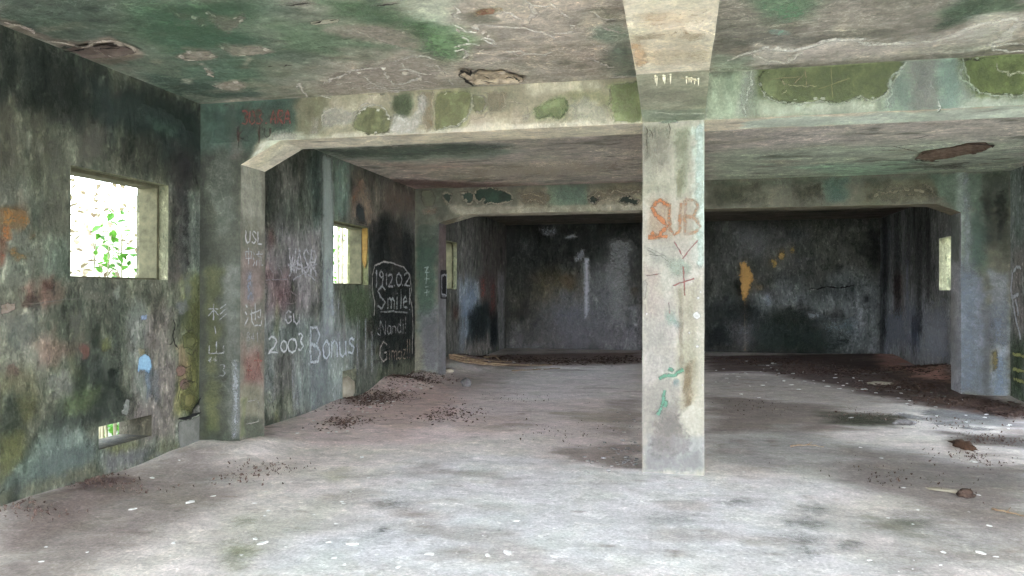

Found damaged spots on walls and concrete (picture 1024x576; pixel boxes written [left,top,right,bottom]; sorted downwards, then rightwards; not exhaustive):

spalling [48,40,136,59]
peeling [296,6,568,135]
peeling [758,62,906,106]
peeling [961,55,1024,98]
spalling [882,142,995,169]
peeling [442,187,550,205]
leakage [576,250,589,319]